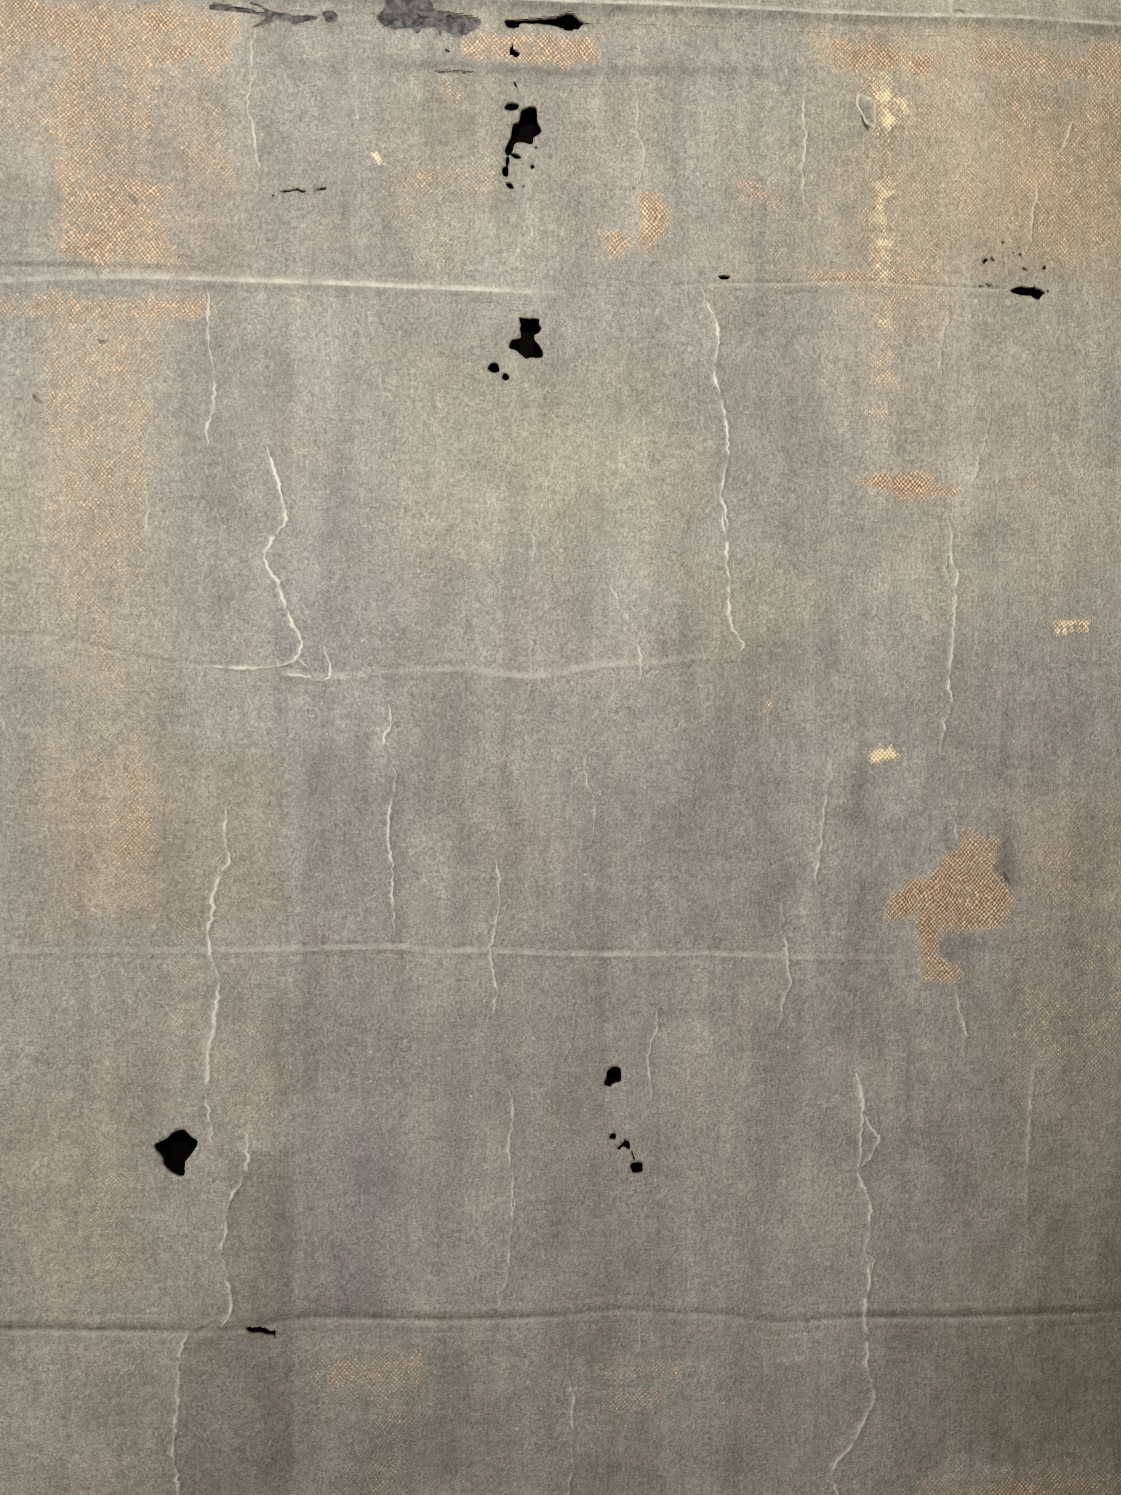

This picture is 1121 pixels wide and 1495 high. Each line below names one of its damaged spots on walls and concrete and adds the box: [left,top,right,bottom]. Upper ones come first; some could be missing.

peeling [378,0,481,53]
crack [211,446,335,683]
crack [166,807,255,1495]
crack [825,1069,884,1495]